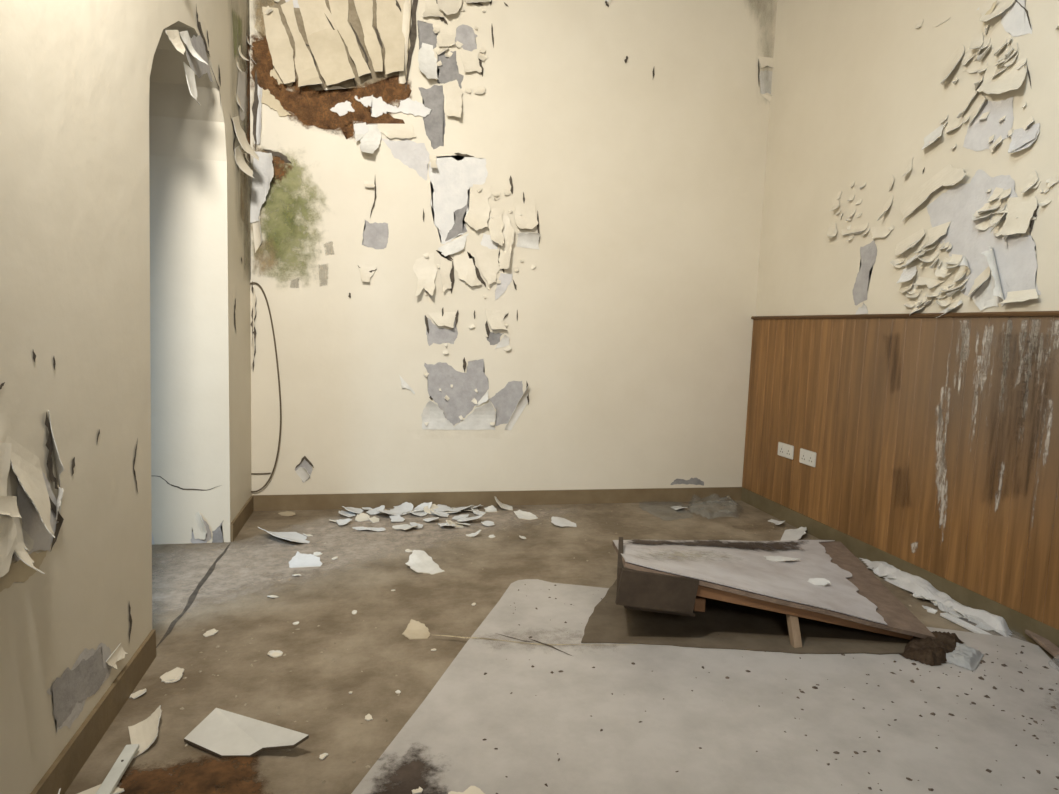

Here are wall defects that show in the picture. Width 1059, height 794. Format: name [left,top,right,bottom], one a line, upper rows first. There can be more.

peeling [165,6,221,106]
damp [233,0,334,288]
peeling [230,0,540,439]
peeling [827,0,1058,318]
damp [936,320,1059,541]
flaking render [47,643,128,733]